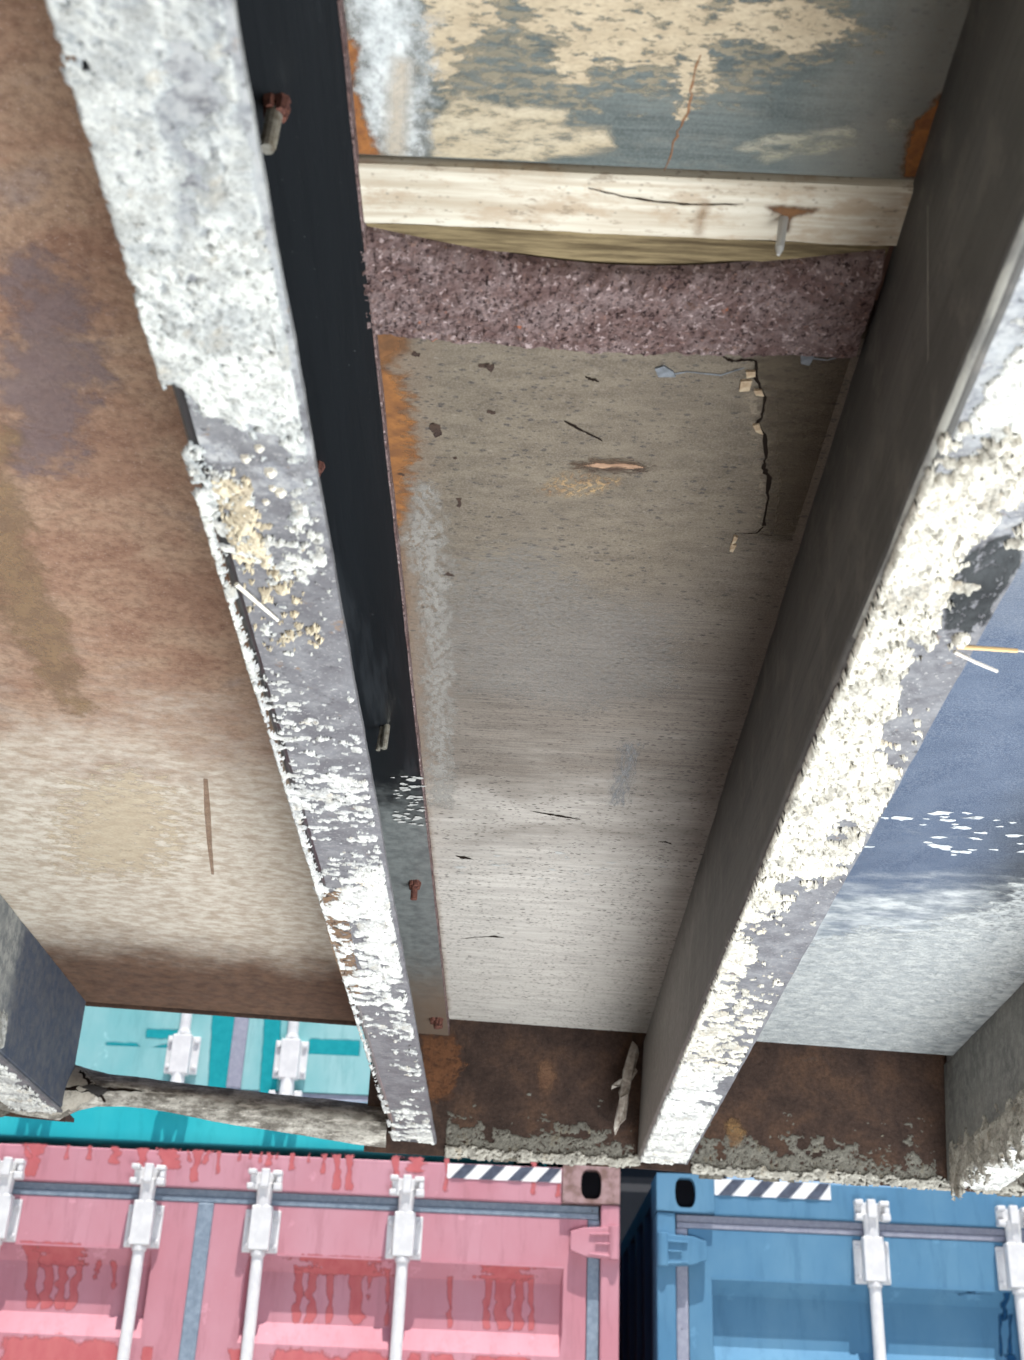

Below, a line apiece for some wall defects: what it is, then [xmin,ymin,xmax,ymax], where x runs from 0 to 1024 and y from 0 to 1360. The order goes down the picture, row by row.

corrosion [902,93,942,179]
corrosion [360,226,885,526]
crack [722,354,850,552]
corrosion [203,779,214,875]
peeling [0,1065,94,1117]